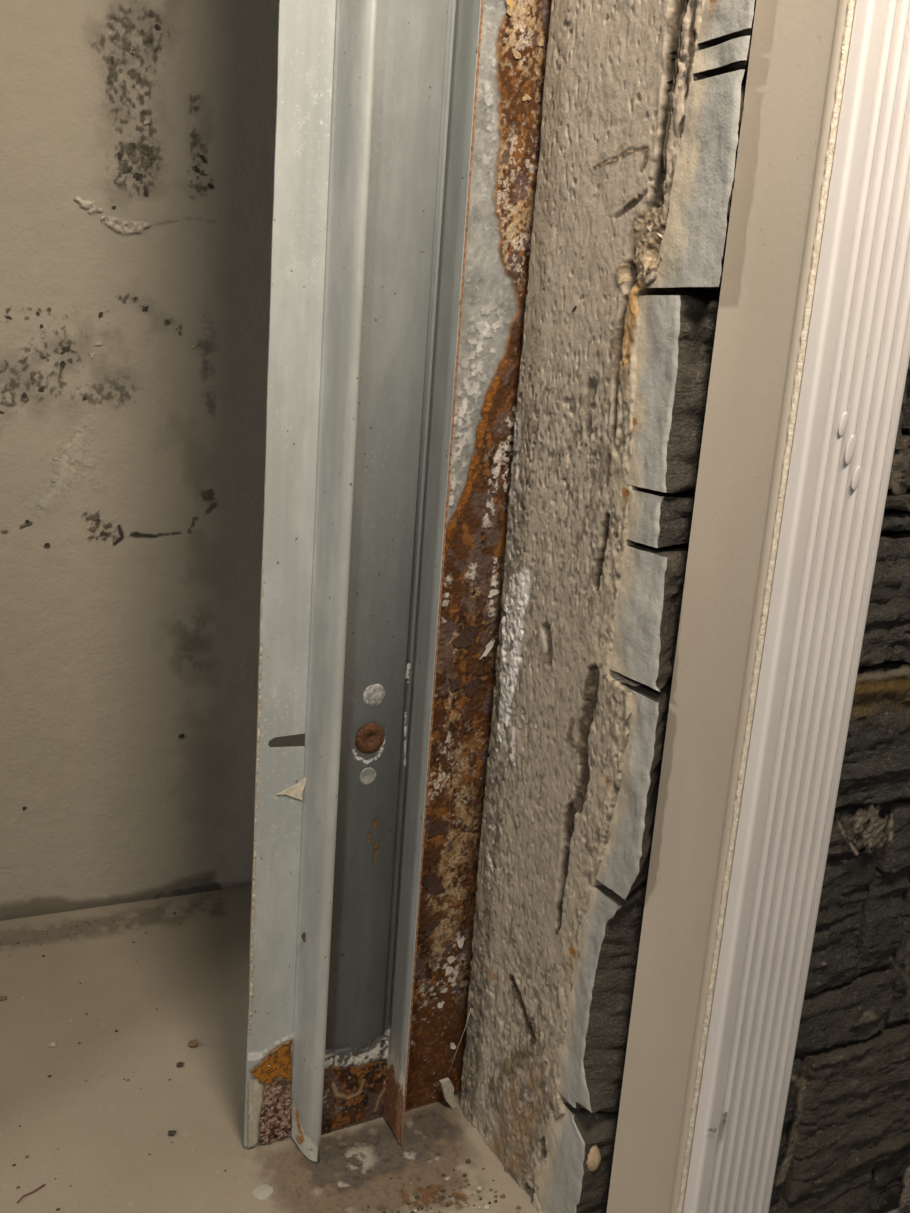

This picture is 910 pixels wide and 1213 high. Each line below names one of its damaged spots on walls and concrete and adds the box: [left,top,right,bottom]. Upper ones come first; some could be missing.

mould [93,6,162,196]
mould [188,128,214,192]
mould [0,307,102,413]
mould [80,384,128,401]
corrosion [247,0,552,1213]